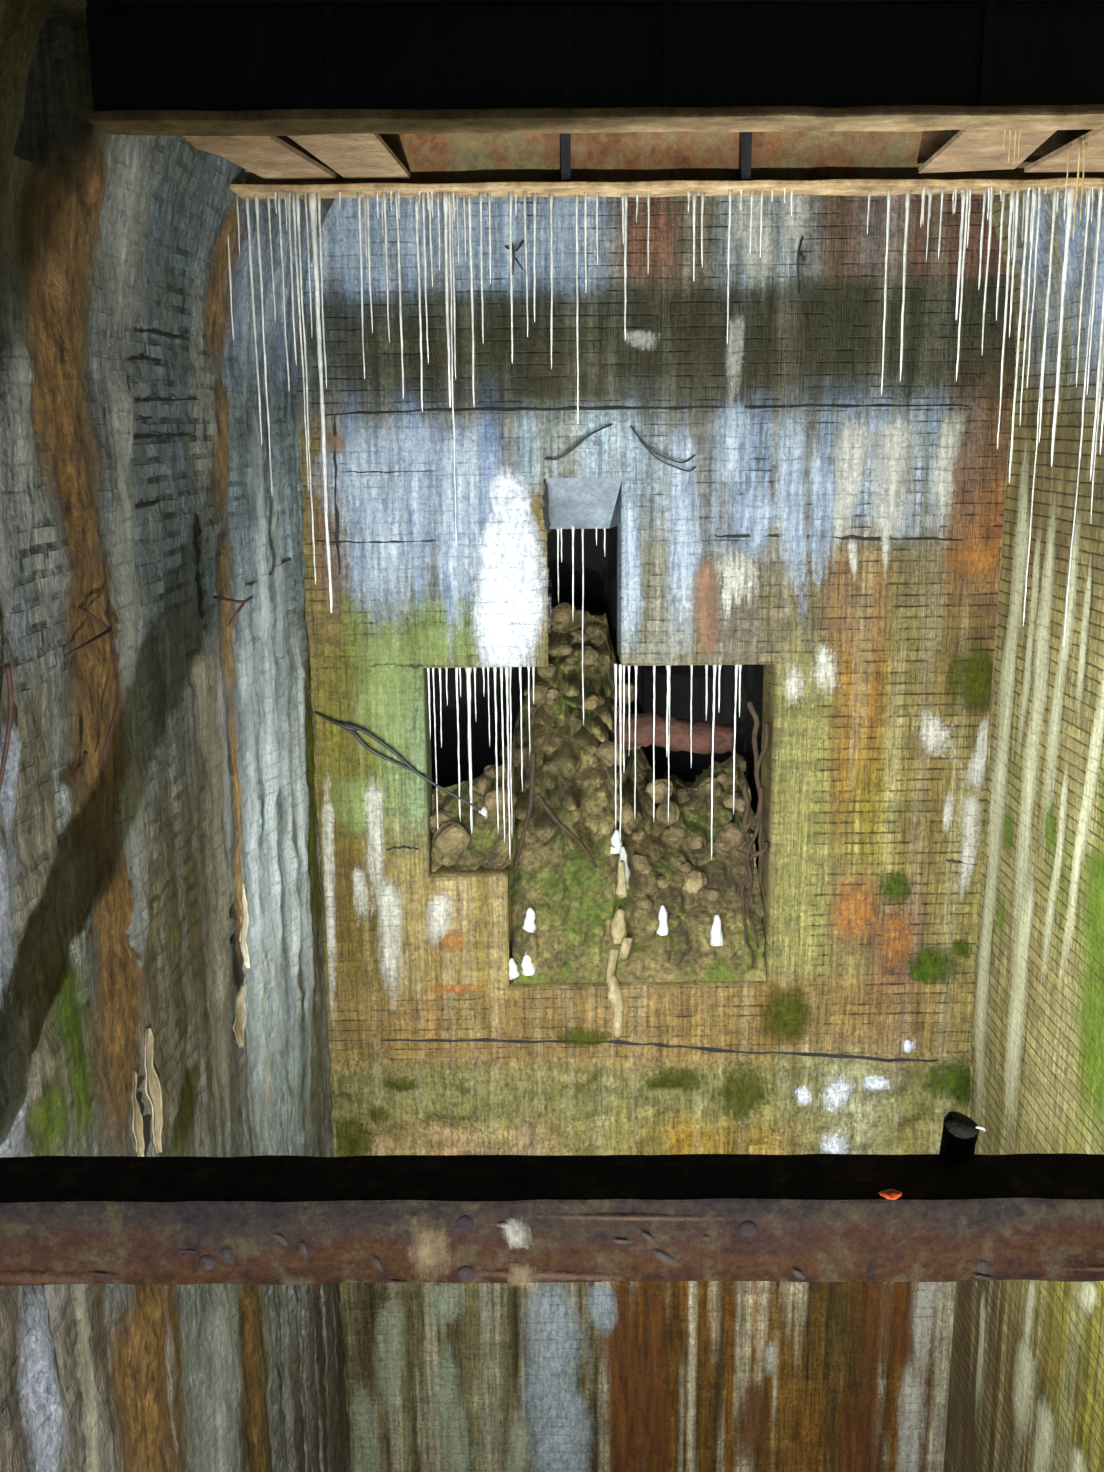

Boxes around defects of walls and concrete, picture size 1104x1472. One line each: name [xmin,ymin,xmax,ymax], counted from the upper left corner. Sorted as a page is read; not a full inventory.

water stain [236,198,381,367]
water stain [400,197,584,282]
corrosion [20,143,147,1136]
water stain [316,423,543,745]
water stain [718,416,914,618]
water stain [943,455,1104,1119]
corrosion [829,885,913,966]
peeling [131,1028,163,1157]
crack [380,1038,938,1062]
corrosion [118,1285,167,1472]
corrosion [599,1292,668,1472]
corrosion [839,1282,915,1472]